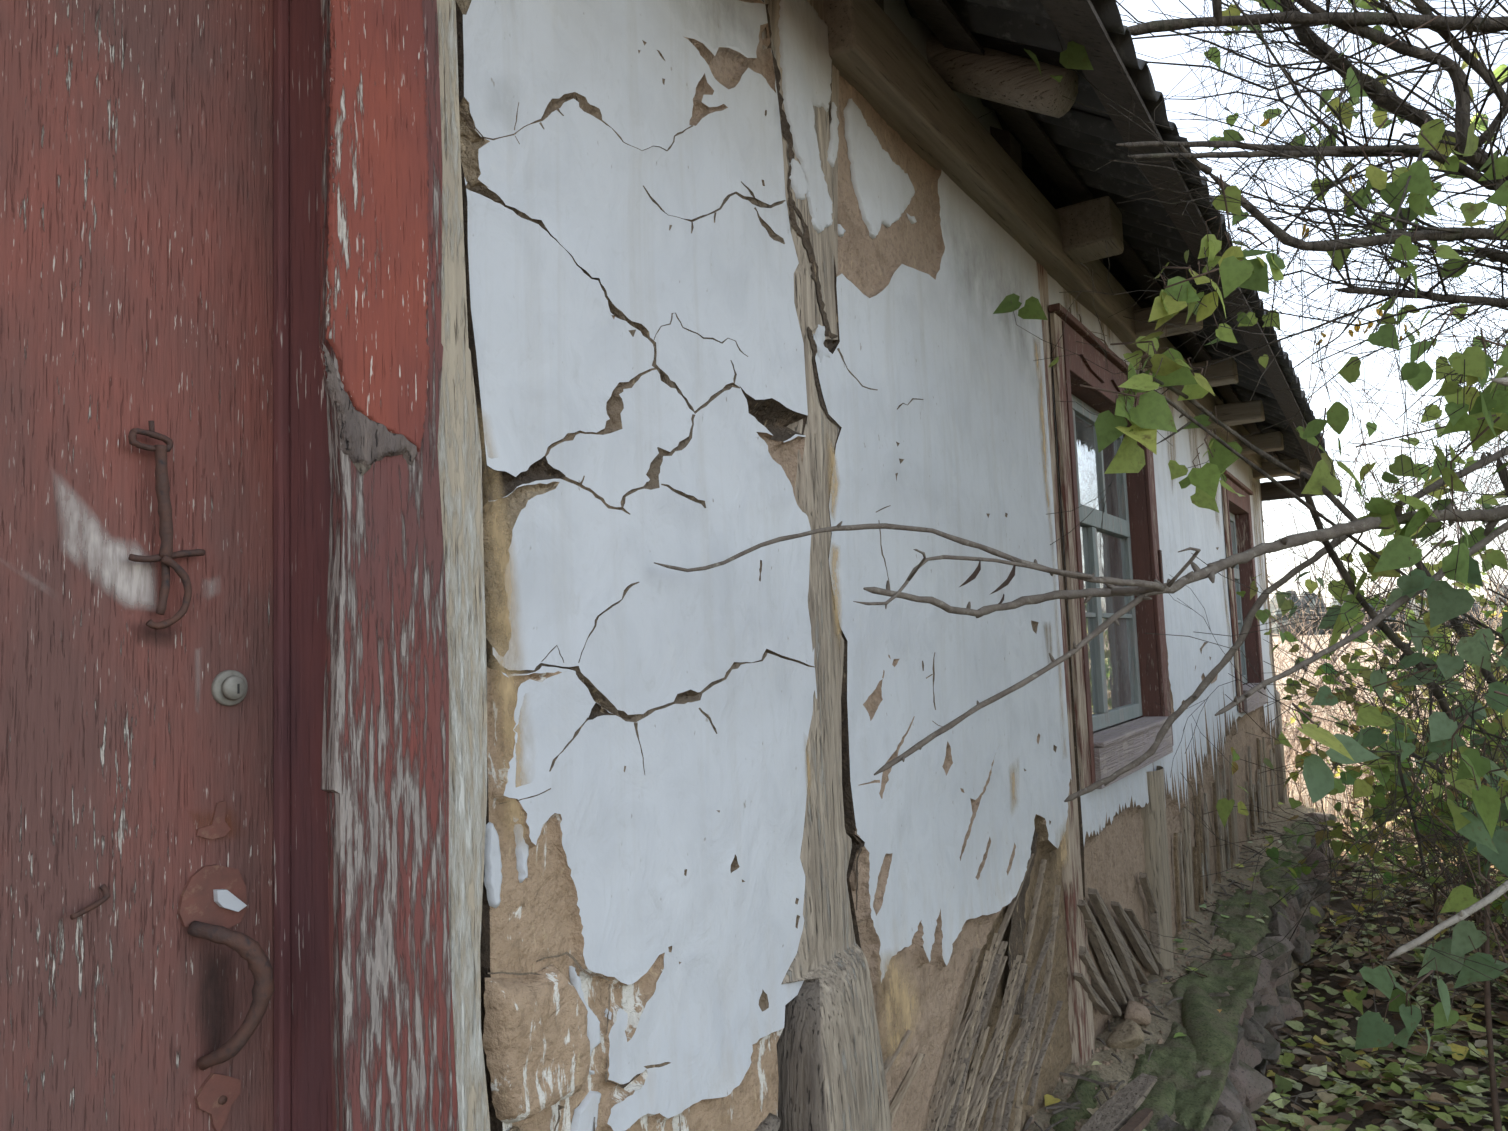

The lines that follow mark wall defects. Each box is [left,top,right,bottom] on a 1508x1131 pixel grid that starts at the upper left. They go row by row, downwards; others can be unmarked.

crack [462,182,748,515]
crack [459,4,923,429]
flaking render [685,0,945,298]
flaking render [480,456,784,1131]
crack [486,582,845,804]
flaking render [863,655,899,721]
crack [876,505,891,586]
flaking render [942,741,953,776]
flaking render [845,814,1072,1131]
flaking render [960,757,995,861]
flaking render [1081,797,1150,1039]
flaking render [1153,486,1278,942]